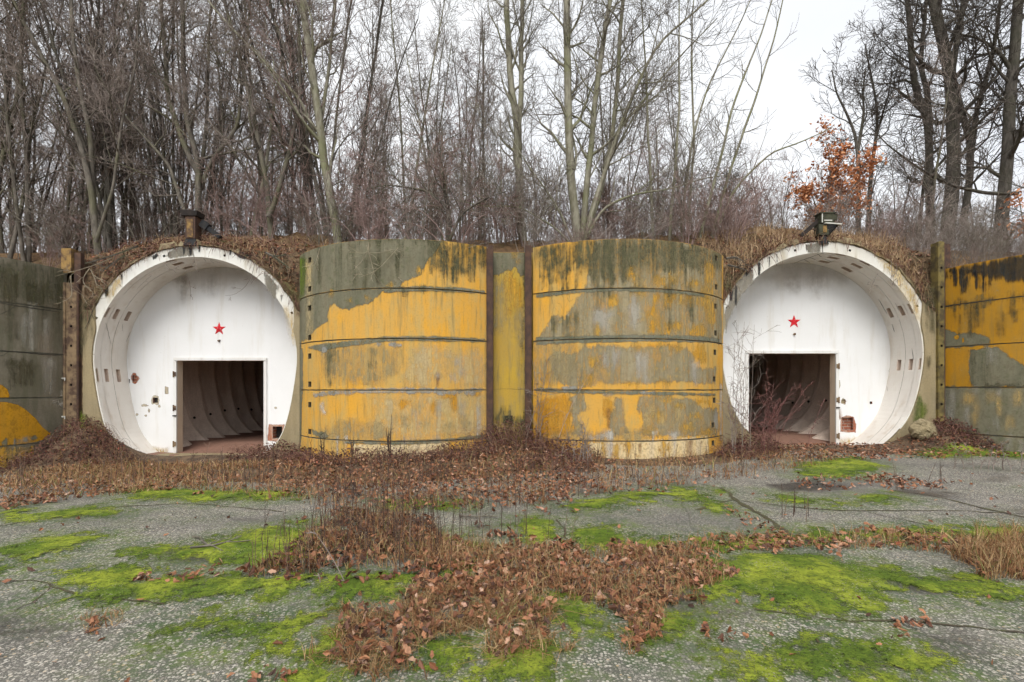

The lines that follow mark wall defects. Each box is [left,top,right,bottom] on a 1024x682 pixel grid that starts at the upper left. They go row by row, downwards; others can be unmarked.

peeling [288,239,443,445]
peeling [533,239,753,438]
peeling [945,329,1024,453]
crack [696,487,1024,535]